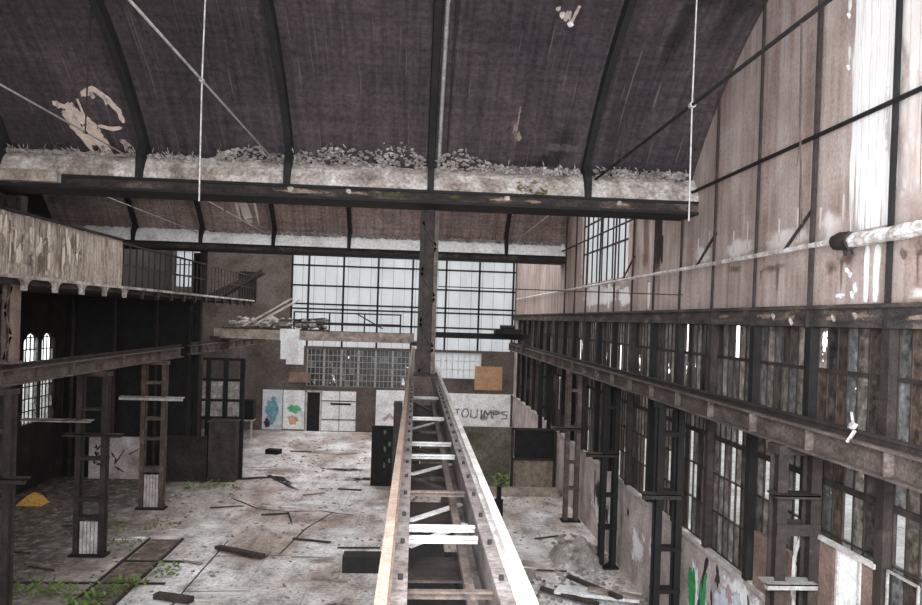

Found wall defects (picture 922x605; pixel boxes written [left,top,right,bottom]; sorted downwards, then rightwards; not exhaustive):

peeling [555,5,581,27]
peeling [52,86,131,153]
damp [766,0,922,255]
peeling [0,213,82,275]
damp [726,222,754,258]